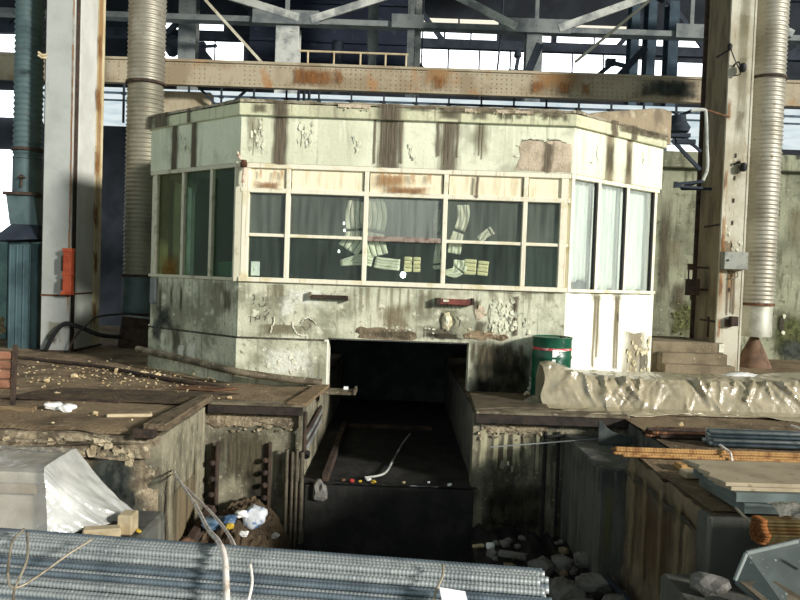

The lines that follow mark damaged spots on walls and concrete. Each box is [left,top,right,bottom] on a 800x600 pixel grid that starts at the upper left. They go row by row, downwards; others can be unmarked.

rust [296,70,343,84]
rust [426,70,448,88]
rust [533,74,589,93]
water stain [254,100,288,165]
water stain [373,104,403,168]
water stain [436,110,459,170]
flaking render [514,138,572,173]
rust [381,172,431,194]
water stain [152,290,195,358]
spalling [355,326,417,341]
flaking render [463,296,531,341]
spalling [0,406,300,541]